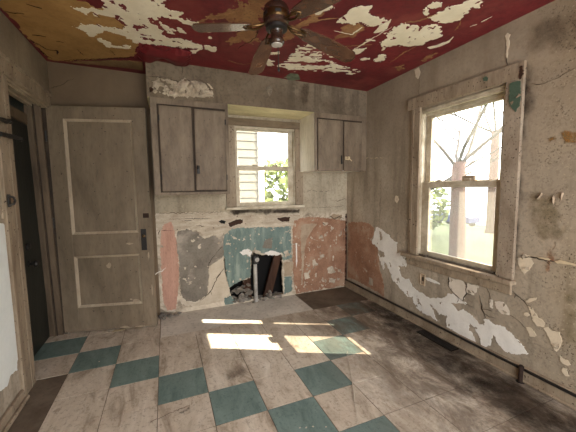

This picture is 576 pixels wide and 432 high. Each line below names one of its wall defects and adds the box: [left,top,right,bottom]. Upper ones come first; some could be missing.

peeling [0,0,270,67]
peeling [283,6,335,41]
peeling [266,44,358,75]
peeling [333,0,483,79]
peeling [508,66,524,112]
flaking render [155,211,528,355]
crack [448,277,493,318]
flaking render [517,253,576,273]
flaking render [524,297,571,376]